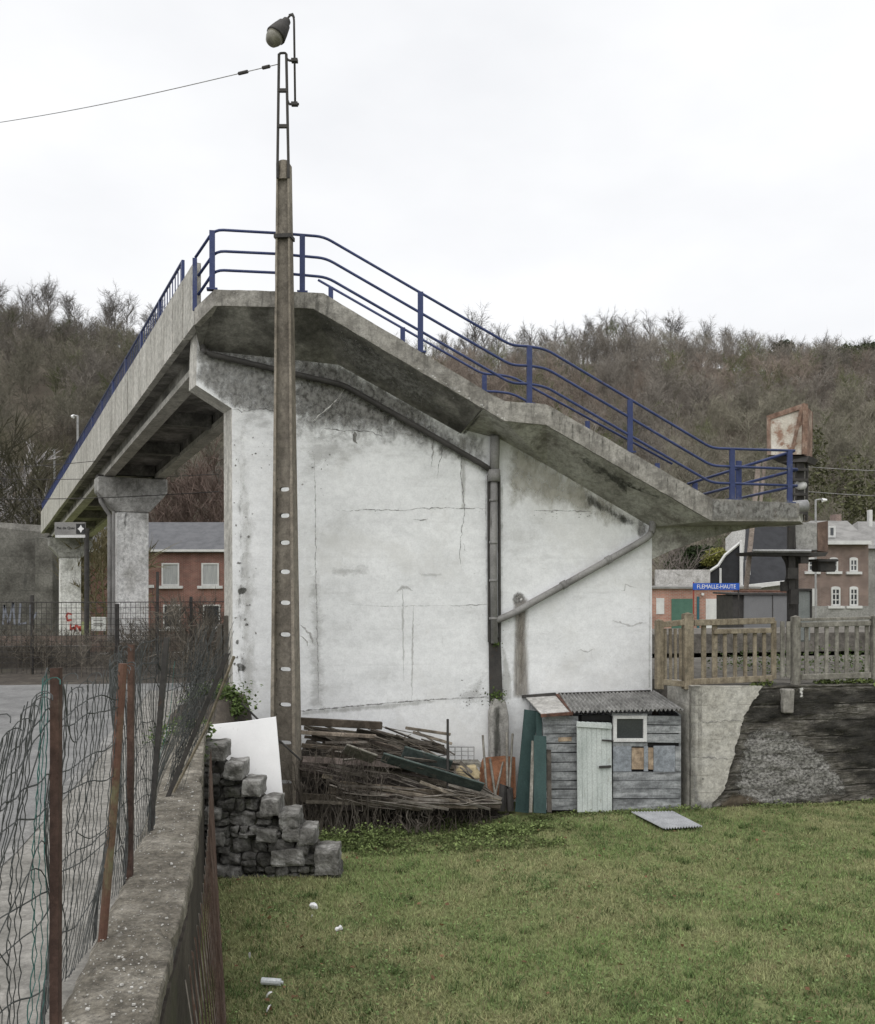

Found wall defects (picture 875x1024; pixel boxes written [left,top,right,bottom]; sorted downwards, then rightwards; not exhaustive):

crack [313,390,381,443]
water stain [295,338,482,457]
crack [352,438,485,563]
water stain [511,451,655,536]
water stain [515,599,527,696]
water stain [748,688,875,788]